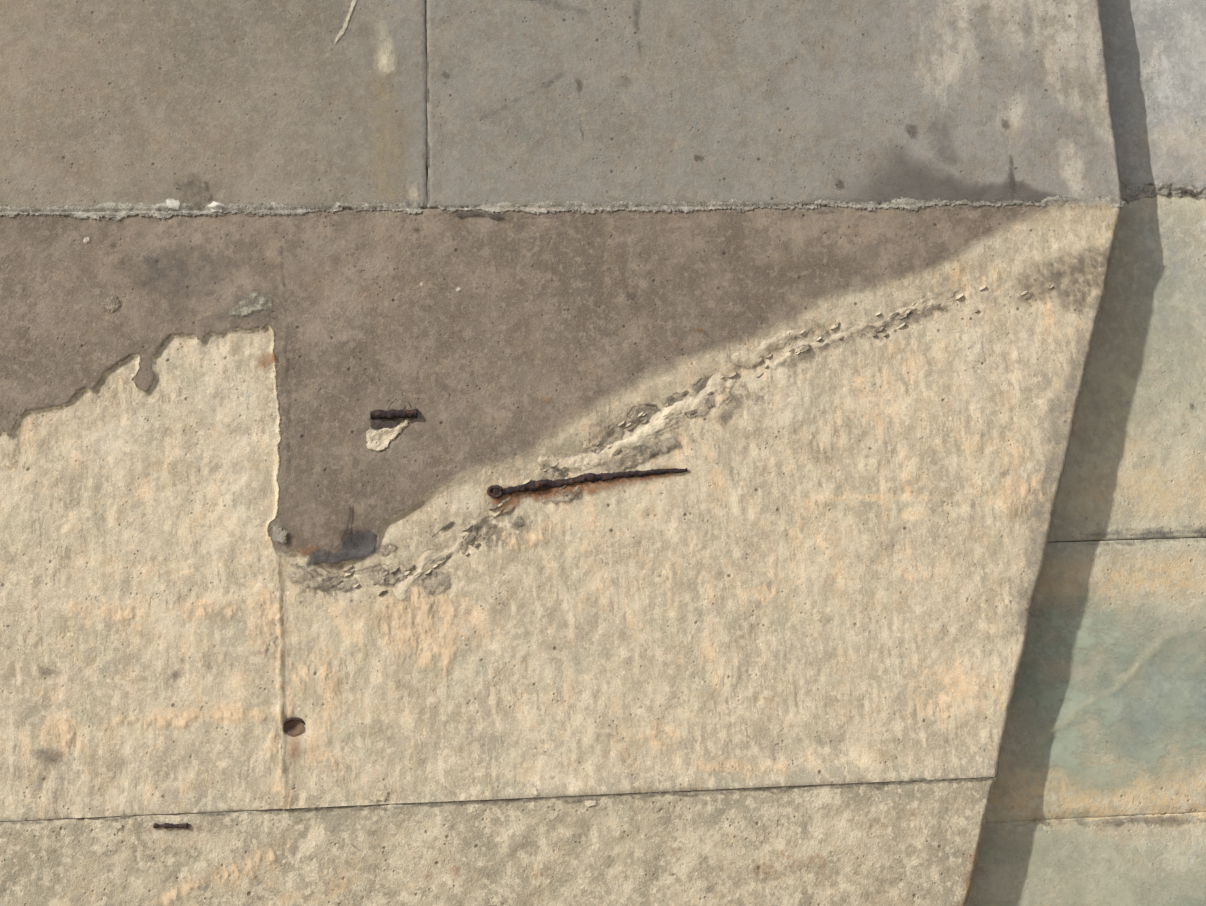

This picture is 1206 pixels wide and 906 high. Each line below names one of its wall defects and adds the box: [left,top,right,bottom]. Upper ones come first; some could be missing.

damp [884,157,1057,203]
spalling [0,204,1121,830]